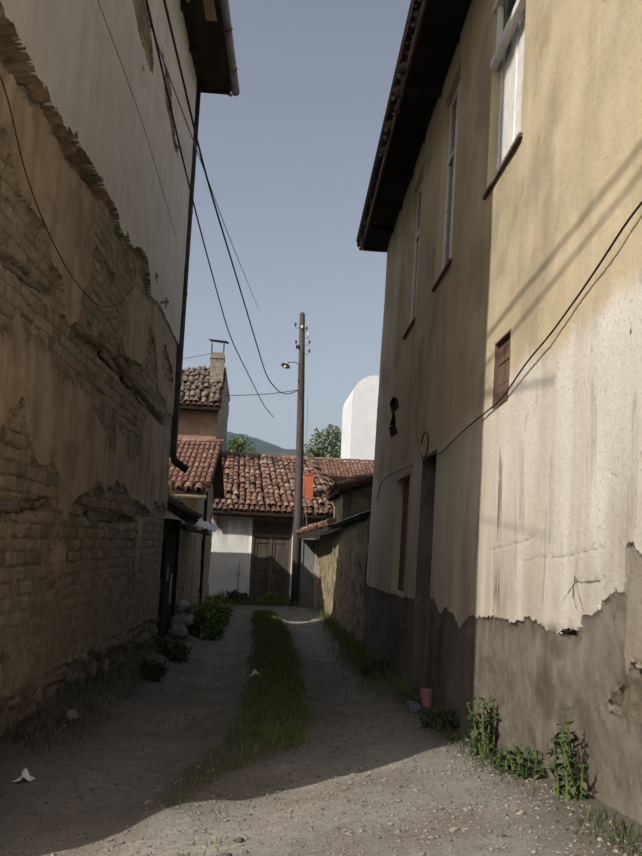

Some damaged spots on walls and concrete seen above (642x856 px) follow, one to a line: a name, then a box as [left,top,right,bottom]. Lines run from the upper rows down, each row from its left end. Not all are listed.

spalling [0,0,179,448]
spalling [0,396,167,699]
peeling [362,584,642,825]